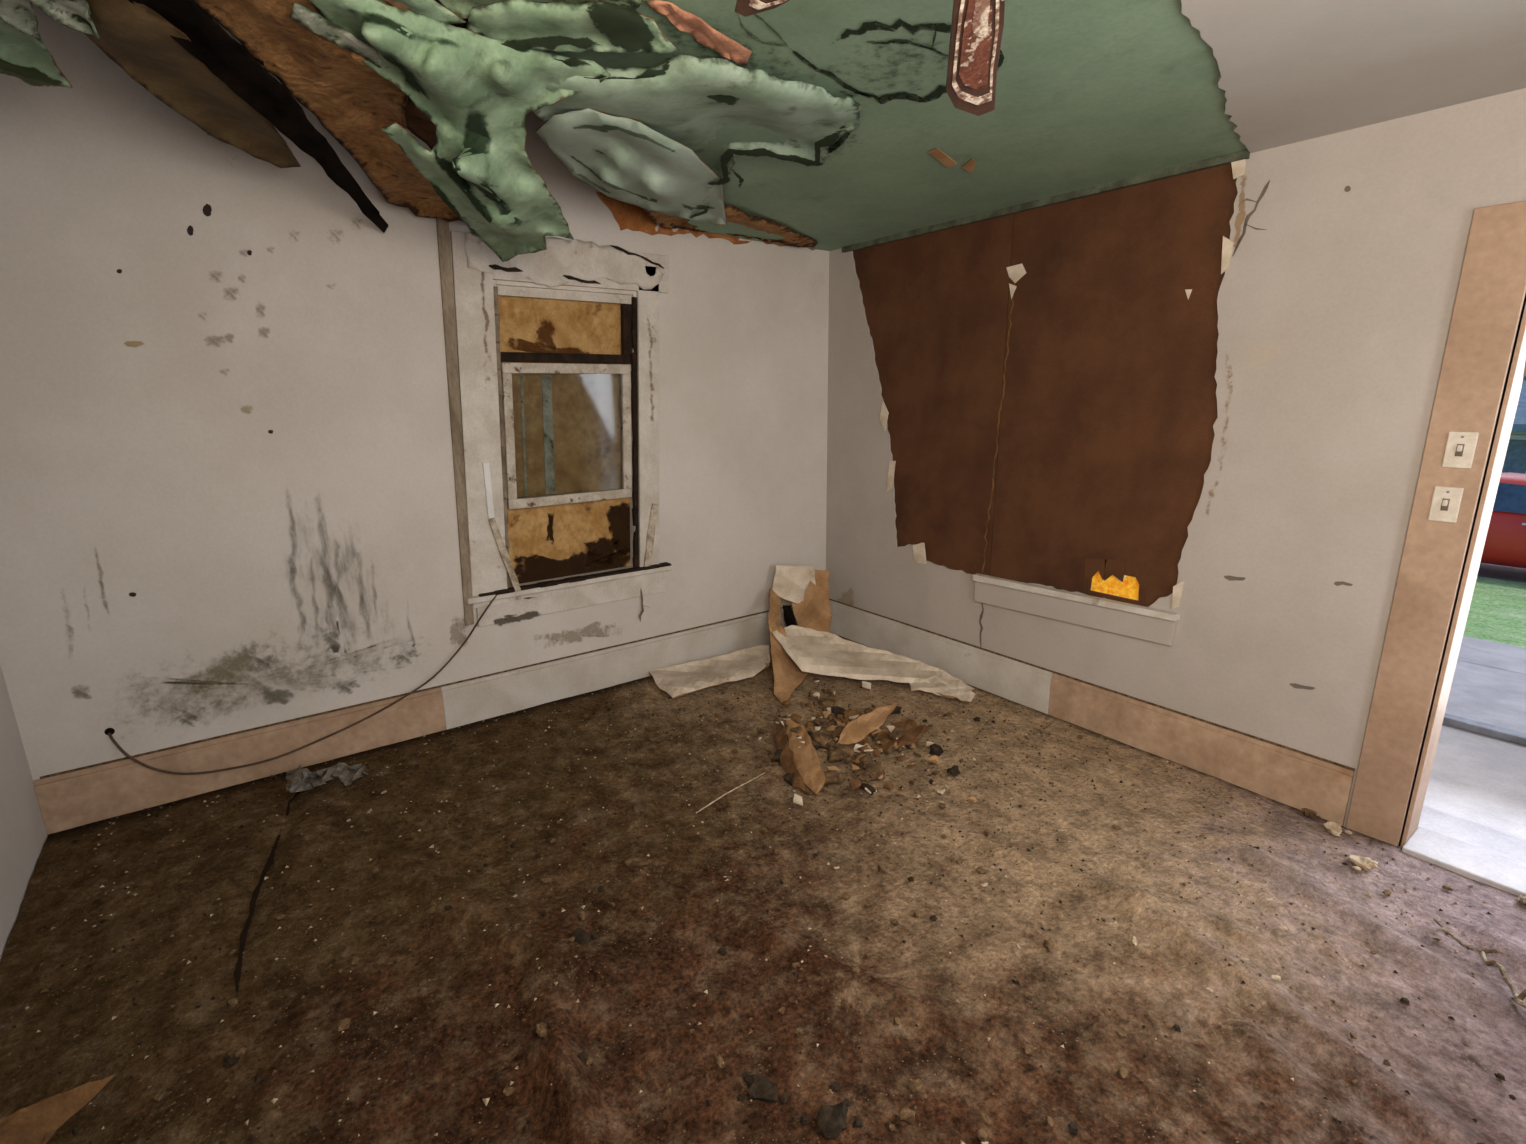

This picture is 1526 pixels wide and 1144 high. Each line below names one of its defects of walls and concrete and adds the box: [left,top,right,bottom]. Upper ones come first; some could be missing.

peeling [0,18,72,88]
peeling [290,0,1247,609]
damp [198,648,320,704]